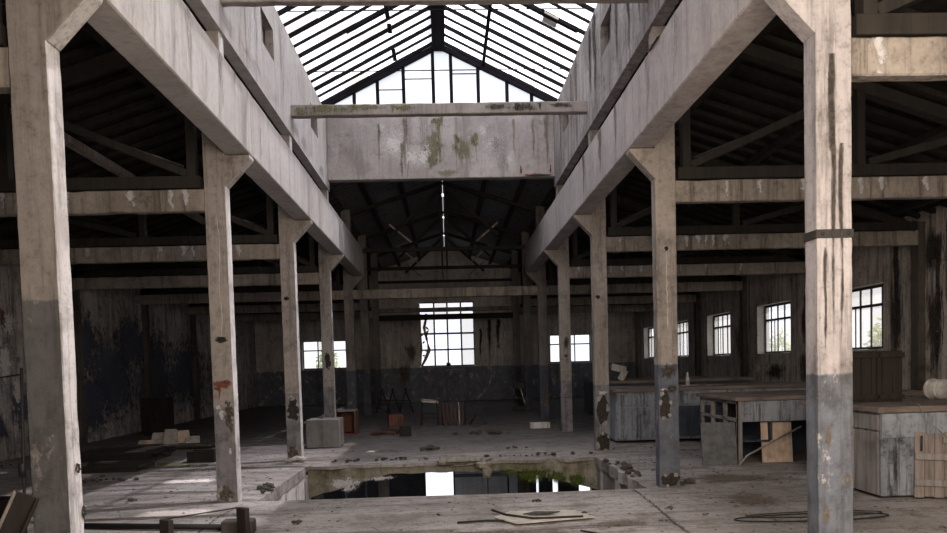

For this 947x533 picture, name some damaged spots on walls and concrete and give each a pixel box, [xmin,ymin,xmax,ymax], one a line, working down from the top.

water stain [376,118,440,175]
water stain [531,103,561,157]
water stain [934,221,947,356]
rust [213,380,231,397]
spalling [216,400,234,433]
spalling [596,391,610,451]
spalling [659,389,672,420]
spalling [216,485,235,502]
spalling [661,473,680,488]